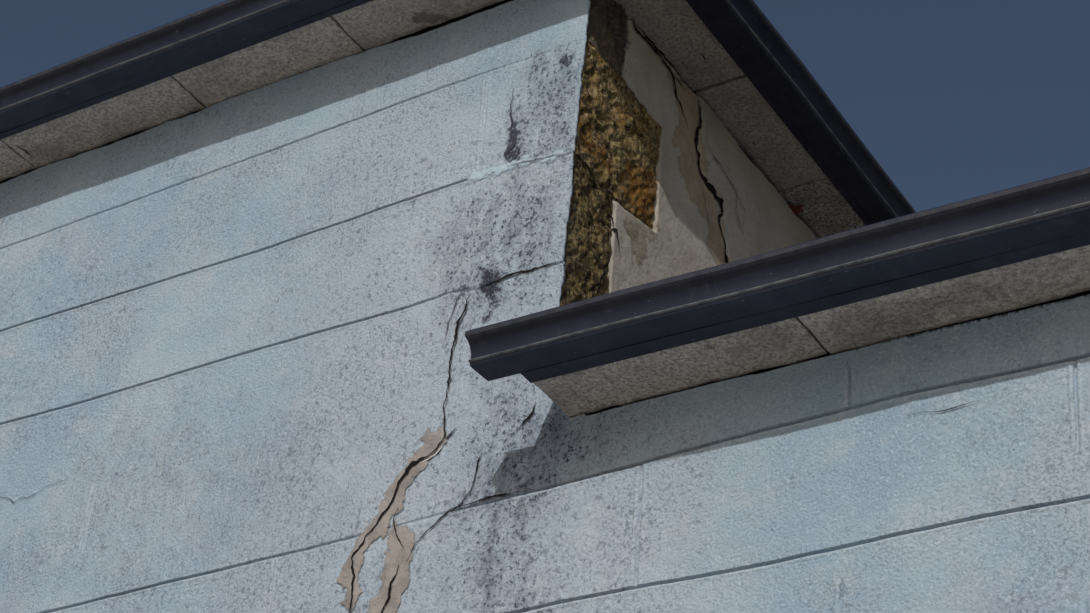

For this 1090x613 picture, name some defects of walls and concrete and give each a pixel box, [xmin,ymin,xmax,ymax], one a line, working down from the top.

damp [422,167,571,339]
crack [572,149,620,291]
crack [629,19,745,263]
flaking render [668,65,730,266]
flaking render [337,425,448,613]
crack [348,262,558,613]